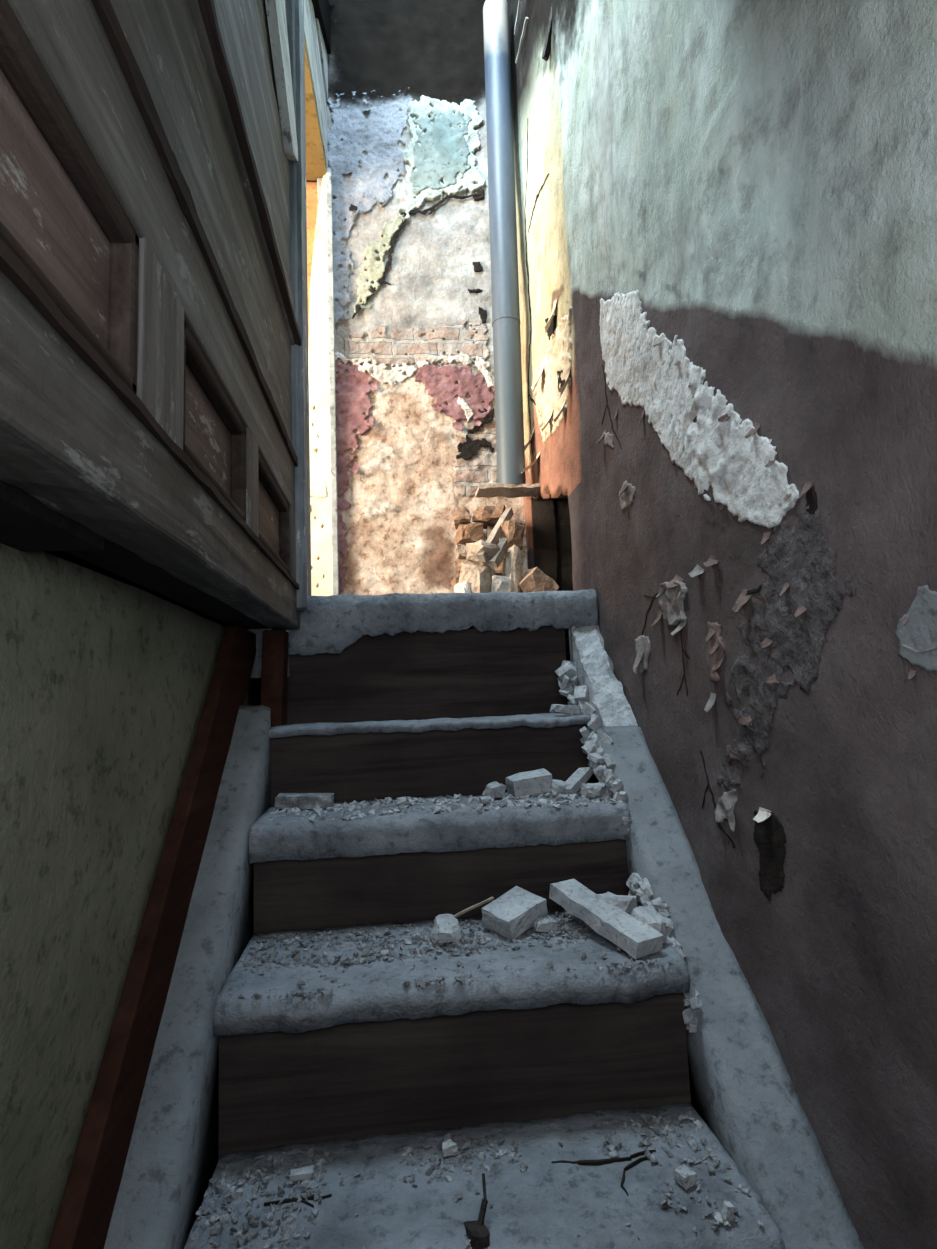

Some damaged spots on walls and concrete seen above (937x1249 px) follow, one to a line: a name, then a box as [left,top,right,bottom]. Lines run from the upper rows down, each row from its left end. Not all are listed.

peeling [326,87,497,595]
peeling [596,290,818,545]
spalling [732,585,762,612]
peeling [632,635,650,674]
peeling [704,621,725,713]
peeling [714,789,738,832]
flaking render [753,807,786,902]